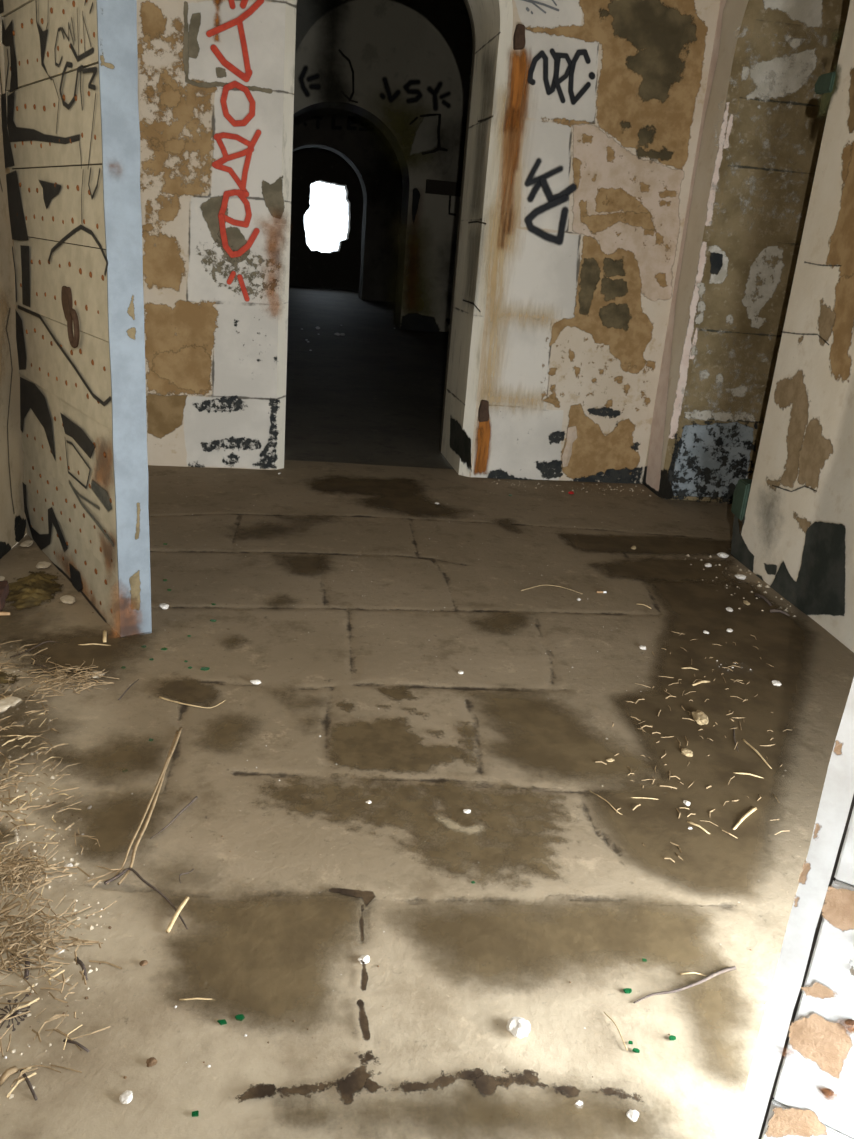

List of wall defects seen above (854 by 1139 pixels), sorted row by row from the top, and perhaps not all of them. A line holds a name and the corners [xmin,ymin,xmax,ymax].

peeling [127,1,281,439]
spalling [261,176,285,218]
corrosion [487,50,546,403]
peeling [487,0,846,616]
peeling [818,68,854,382]
peeling [188,397,280,470]
water stain [311,476,462,518]
corrosion [474,418,491,474]
corrosion [112,596,140,637]
water stain [258,533,812,895]
water stain [171,893,365,1027]
water stain [409,899,748,1084]